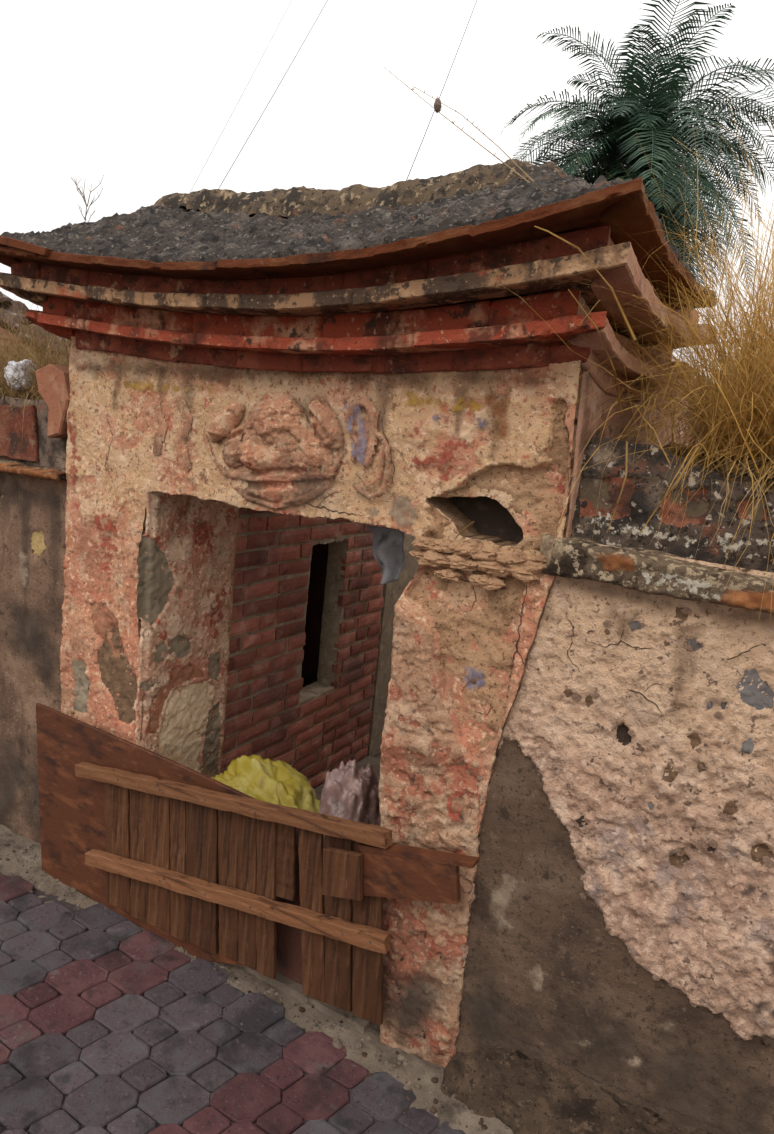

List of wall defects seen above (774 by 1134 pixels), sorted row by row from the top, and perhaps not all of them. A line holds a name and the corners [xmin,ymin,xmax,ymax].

flaking render [427,401,570,551]
peeling [70,602,225,777]
flaking render [134,536,178,625]
crack [562,610,658,672]
peeling [409,566,774,1134]